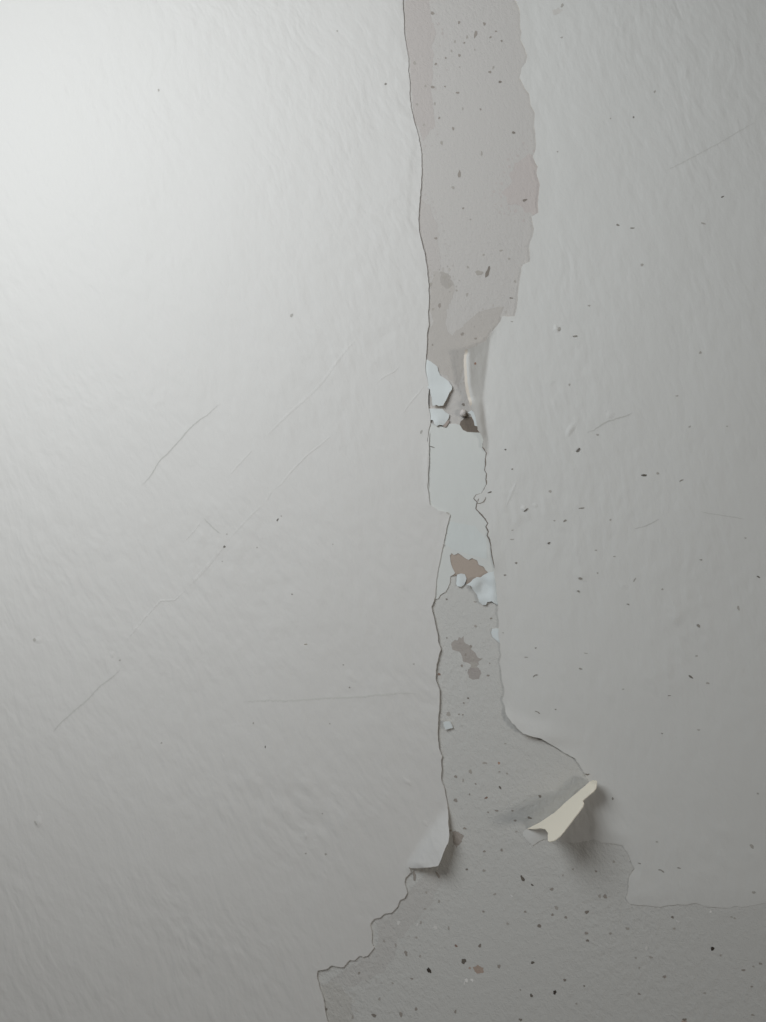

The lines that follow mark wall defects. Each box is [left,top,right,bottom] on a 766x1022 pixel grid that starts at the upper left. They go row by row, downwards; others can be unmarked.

flaking render [408,0,536,427]
crack [473,446,494,565]
flaking render [317,553,766,1022]